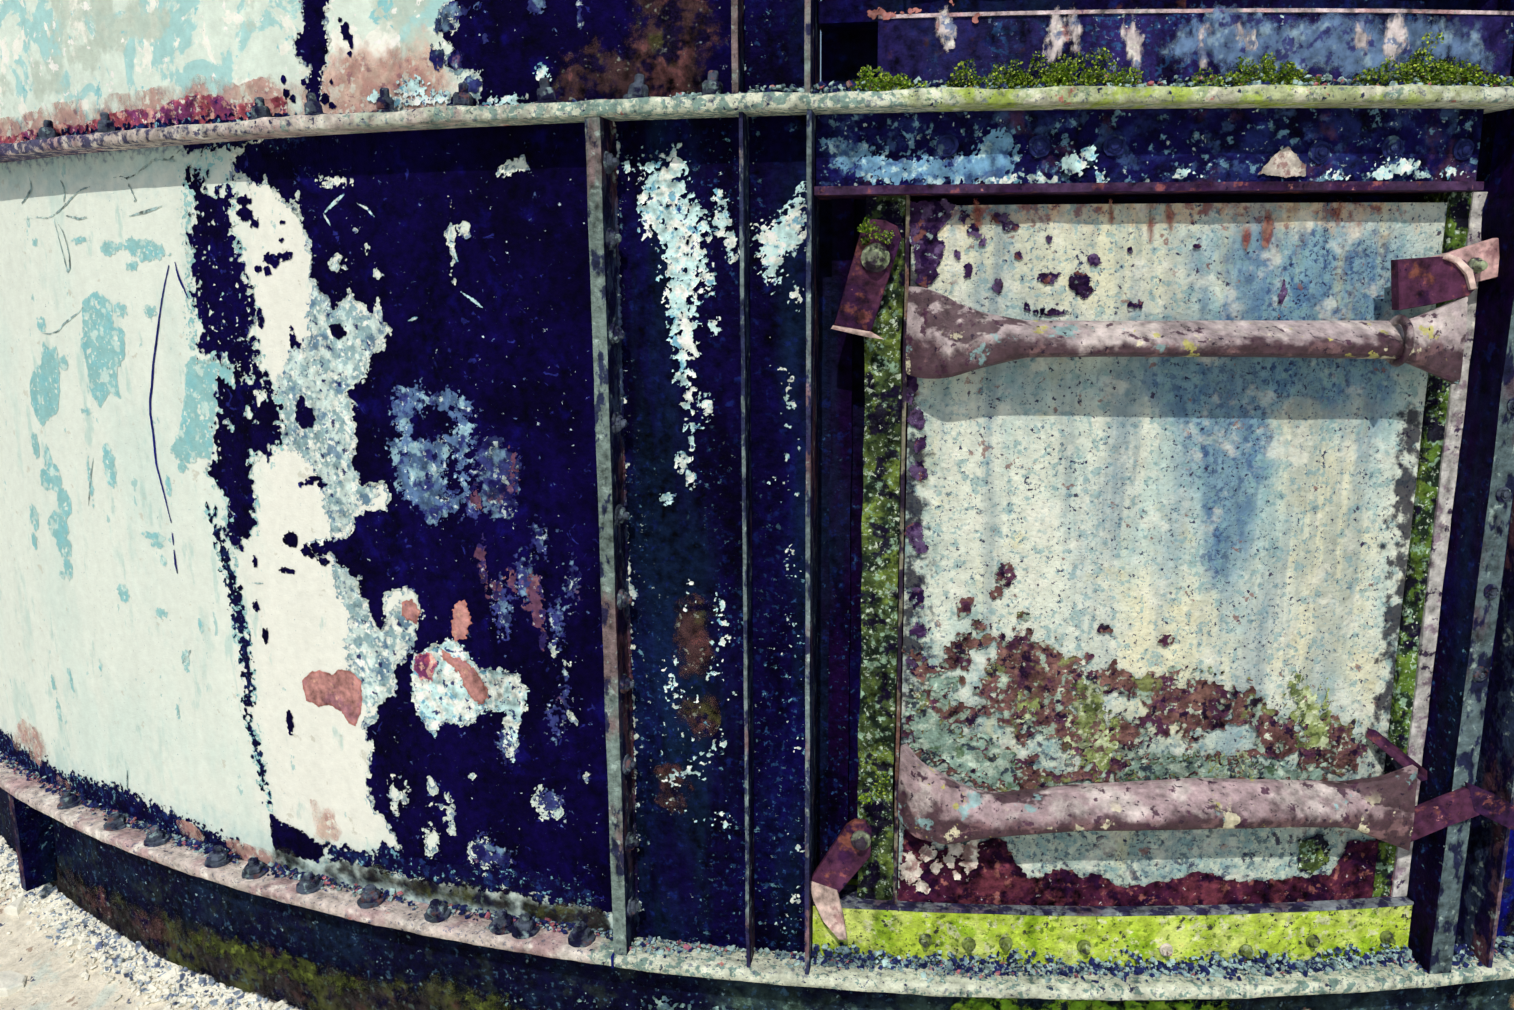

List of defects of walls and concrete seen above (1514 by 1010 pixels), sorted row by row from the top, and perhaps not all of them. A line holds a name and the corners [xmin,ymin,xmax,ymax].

rust [0,49,444,144]
peeling [271,0,353,117]
peeling [429,0,657,106]
rust [553,0,720,102]
peeling [613,121,740,506]
peeling [29,291,157,581]
peeling [71,122,613,918]
rust [302,669,362,726]
peeling [656,592,737,829]
rust [901,562,1374,792]
rust [655,764,695,813]
damp [640,996,749,1010]